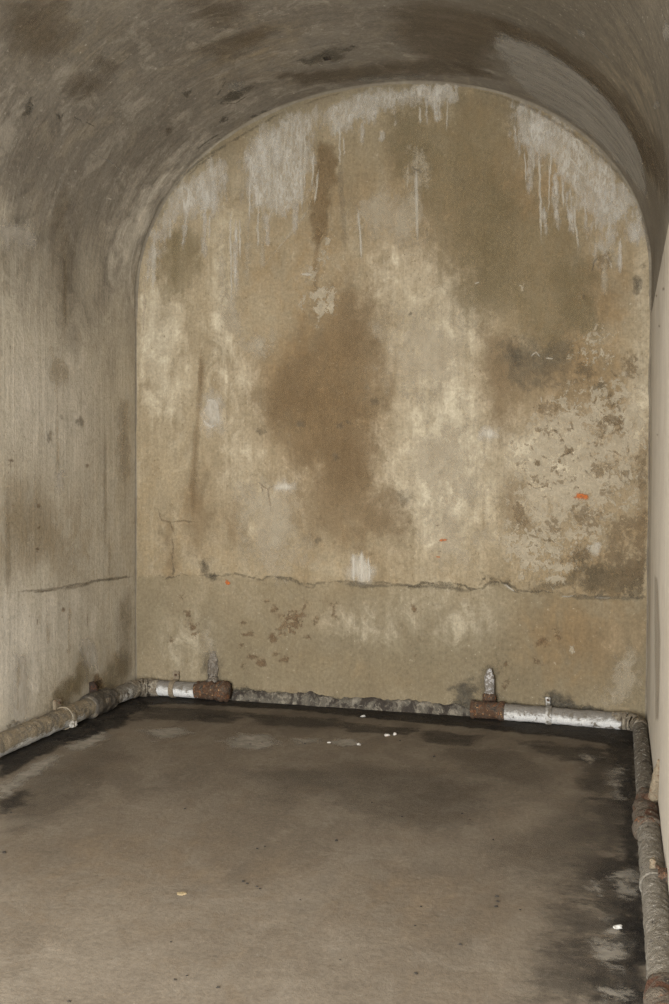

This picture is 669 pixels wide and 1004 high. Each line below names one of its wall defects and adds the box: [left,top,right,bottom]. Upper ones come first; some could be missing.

damp [245,86,455,328]
damp [518,107,632,242]
peeling [498,326,647,584]